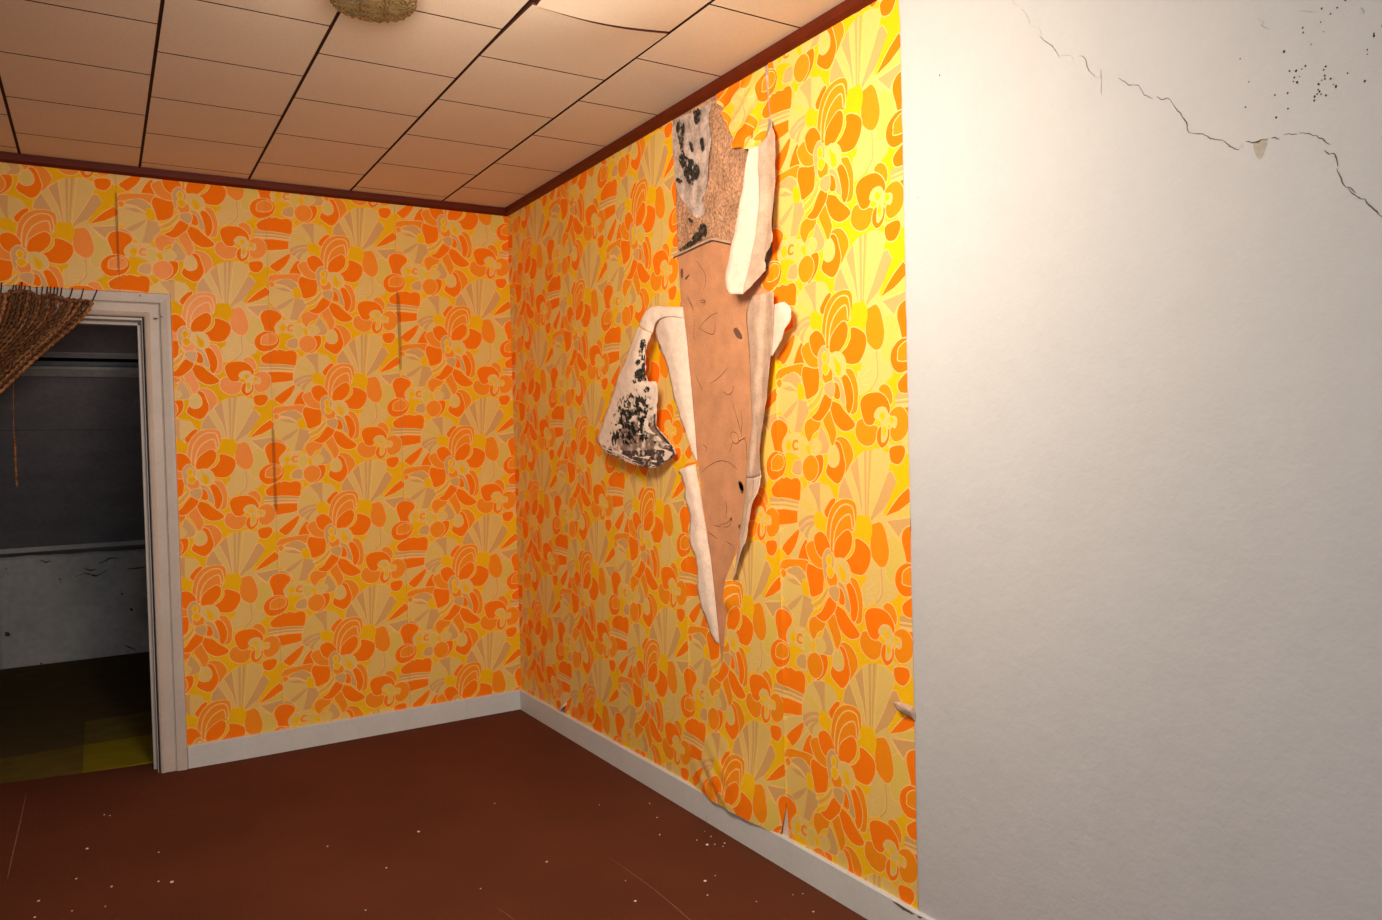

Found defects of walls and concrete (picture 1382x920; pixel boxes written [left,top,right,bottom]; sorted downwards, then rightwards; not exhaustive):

mould [676,108,704,185]
mould [679,218,706,251]
flaking render [673,96,749,257]
crack [1013,1,1382,217]
mould [599,339,675,468]